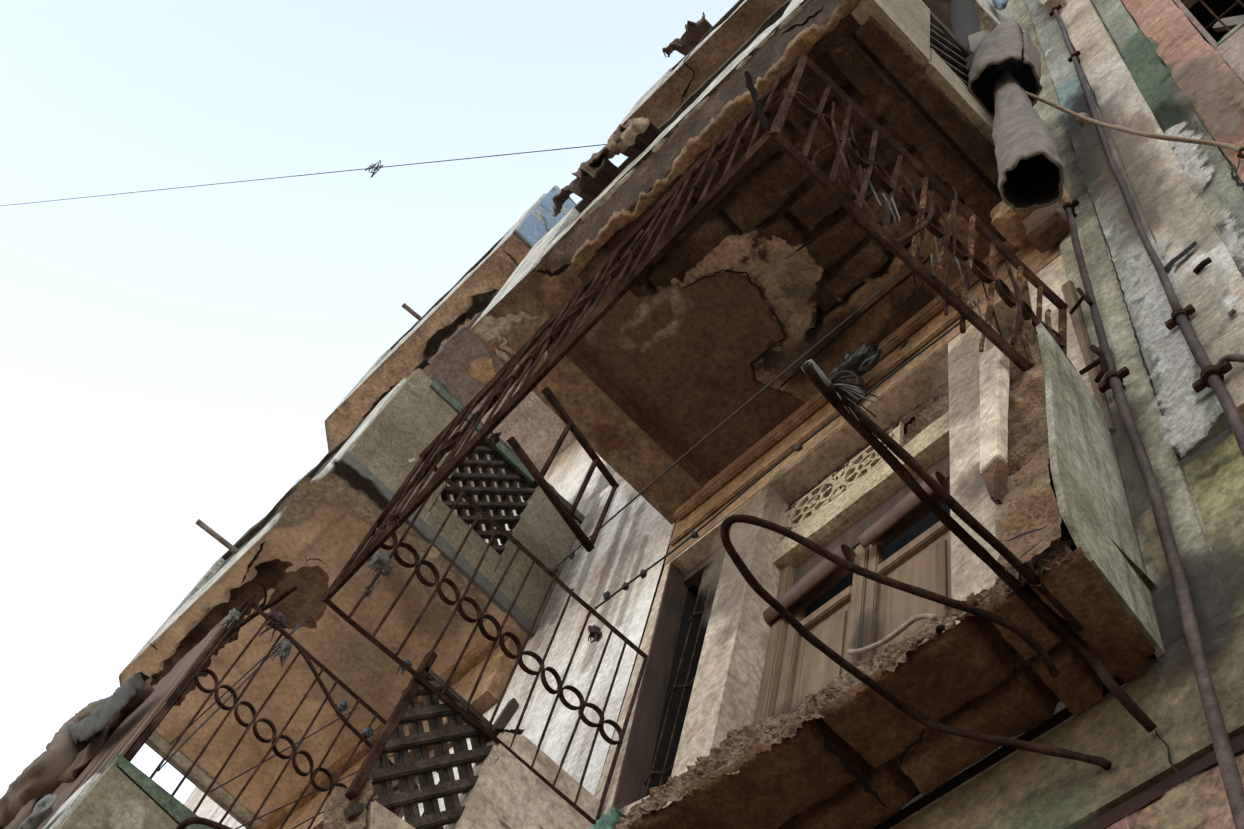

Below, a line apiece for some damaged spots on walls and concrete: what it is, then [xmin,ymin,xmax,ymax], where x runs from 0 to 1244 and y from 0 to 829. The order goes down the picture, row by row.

spalling [416,289,498,370]
spalling [565,0,1157,829]
spalling [150,559,329,706]
crack [821,730,889,809]